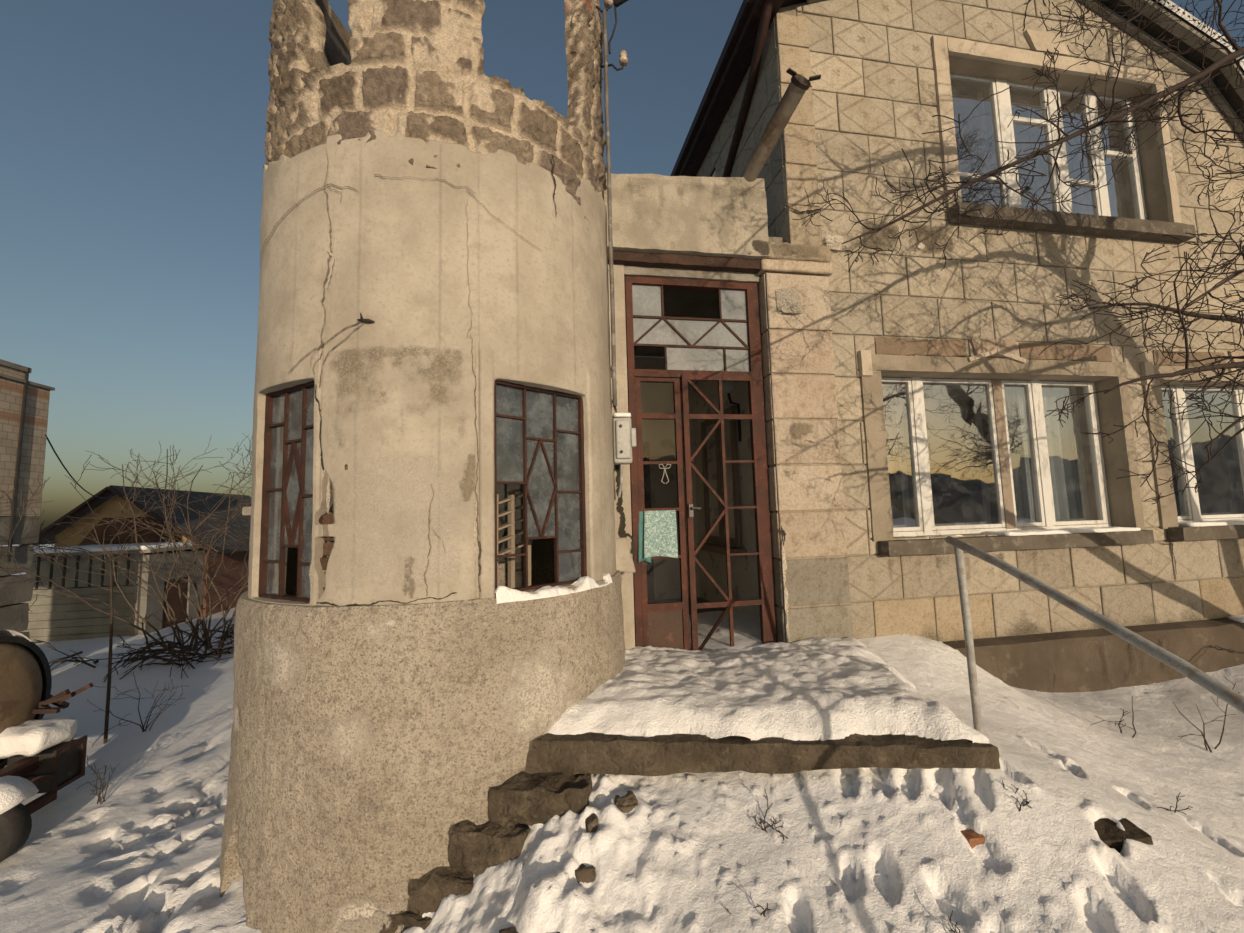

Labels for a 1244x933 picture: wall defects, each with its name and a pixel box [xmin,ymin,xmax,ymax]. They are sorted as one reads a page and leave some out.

crack [258,149,543,606]